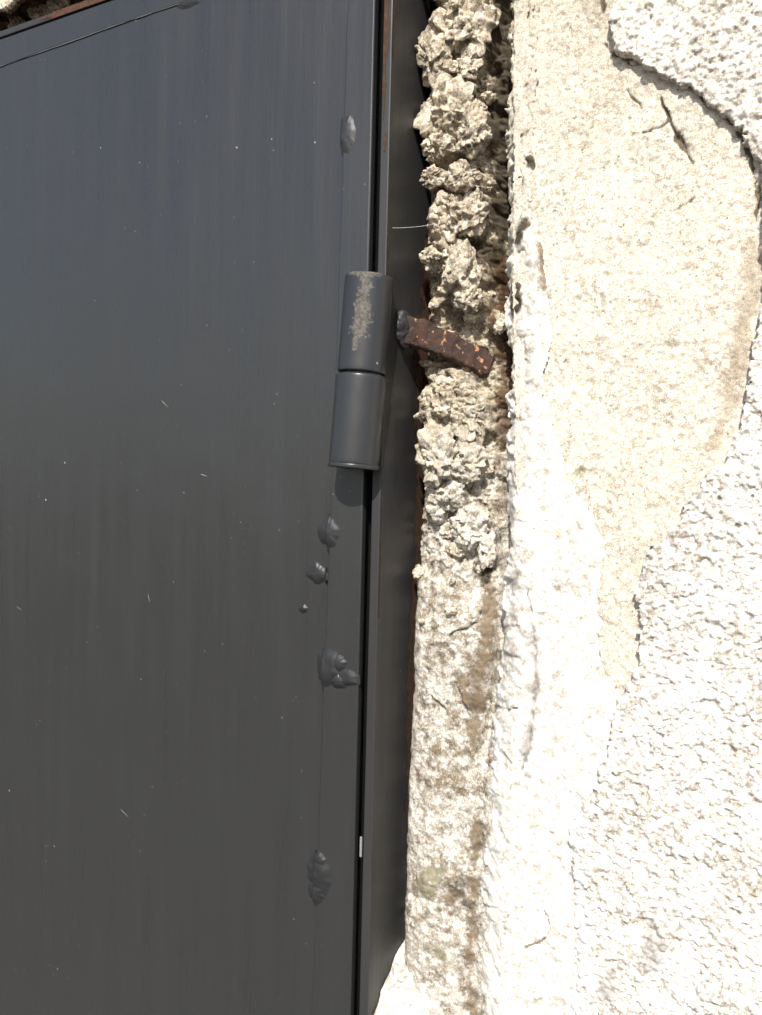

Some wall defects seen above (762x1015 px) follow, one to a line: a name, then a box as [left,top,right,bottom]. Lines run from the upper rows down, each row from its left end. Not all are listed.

crack [0,0,85,31]
crack [599,0,607,13]
crack [605,44,635,66]
crack [631,96,690,159]
crack [726,118,762,219]
flaking render [405,0,762,1015]